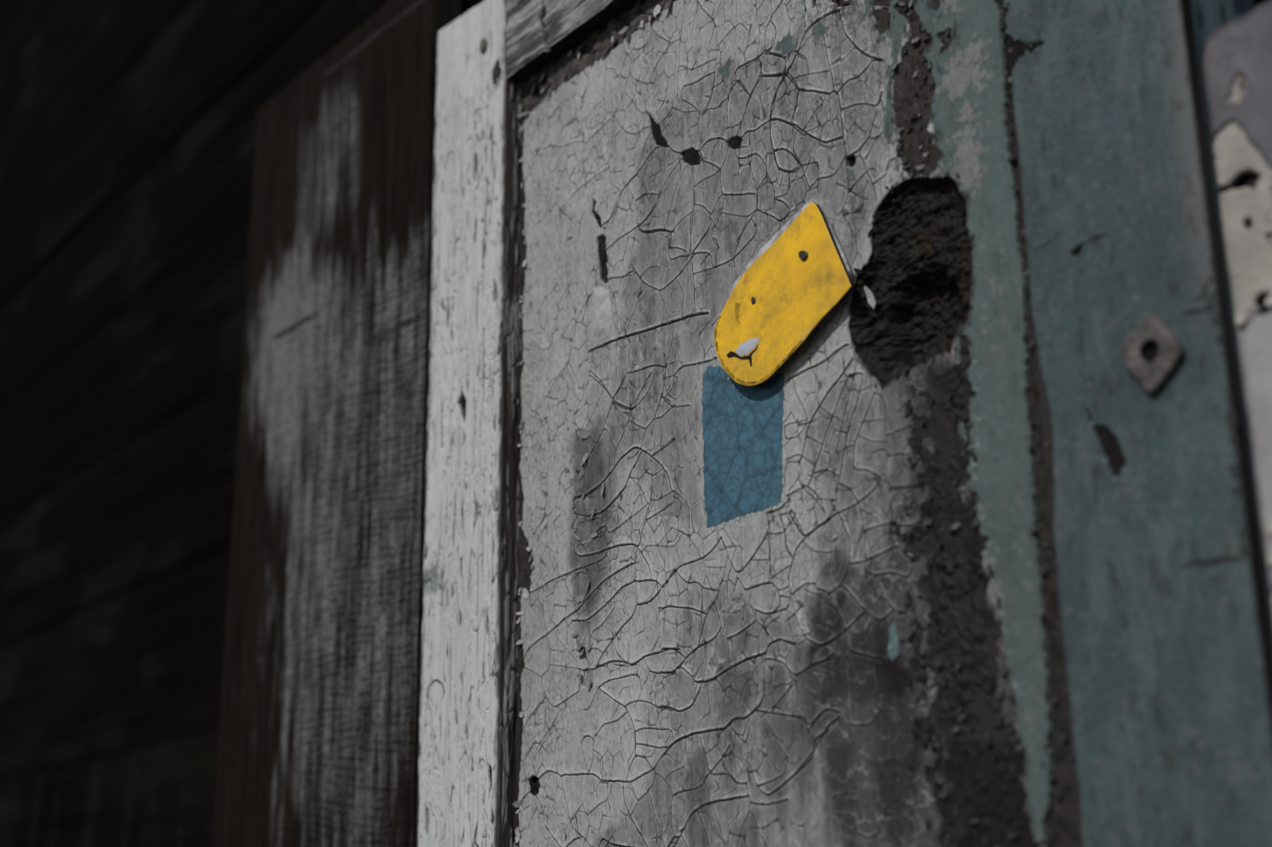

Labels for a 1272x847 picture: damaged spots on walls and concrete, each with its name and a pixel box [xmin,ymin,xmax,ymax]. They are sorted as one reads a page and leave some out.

peeling [490,55,502,95]
peeling [873,0,954,178]
peeling [683,149,701,165]
peeling [1210,121,1272,325]
peeling [864,286,876,309]
spalling [726,338,759,367]
peeling [512,0,675,847]
peeling [890,0,1083,847]
peeling [1085,413,1126,481]
peeling [478,756,494,847]